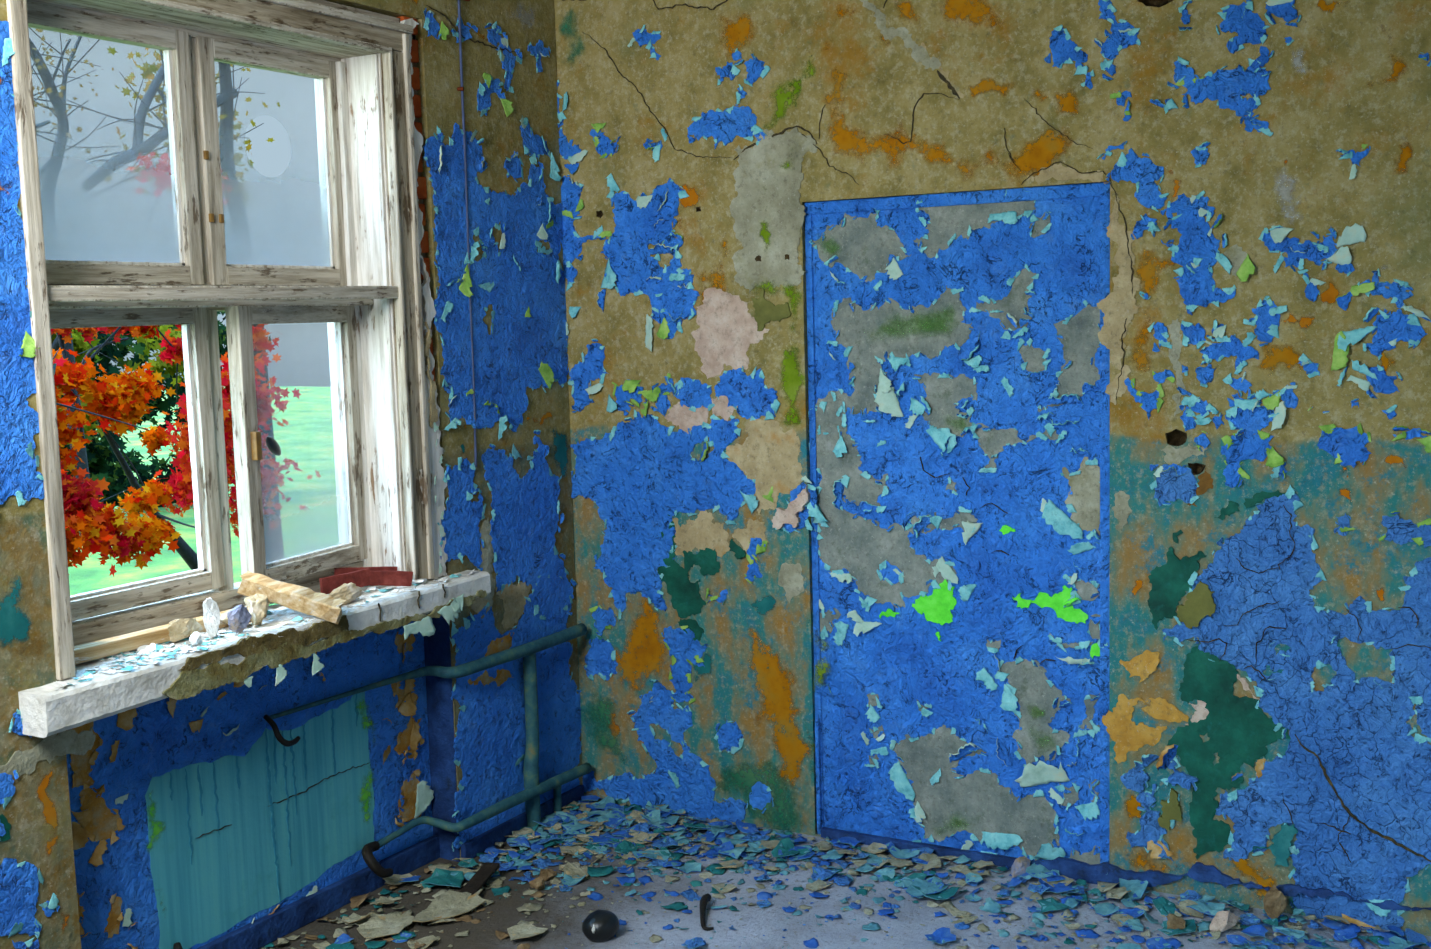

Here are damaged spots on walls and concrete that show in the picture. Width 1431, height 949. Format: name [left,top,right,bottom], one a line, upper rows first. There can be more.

crack [562,0,859,185]
crack [884,93,956,144]
peeling [0,21,45,507]
peeling [162,0,1301,718]
crack [1004,100,1134,400]
peeling [1258,223,1431,453]
peeling [334,872,485,944]
peeling [451,657,526,851]
peeling [484,626,861,877]
peeling [861,640,1172,949]
peeling [1162,485,1431,949]
crack [1283,734,1431,862]